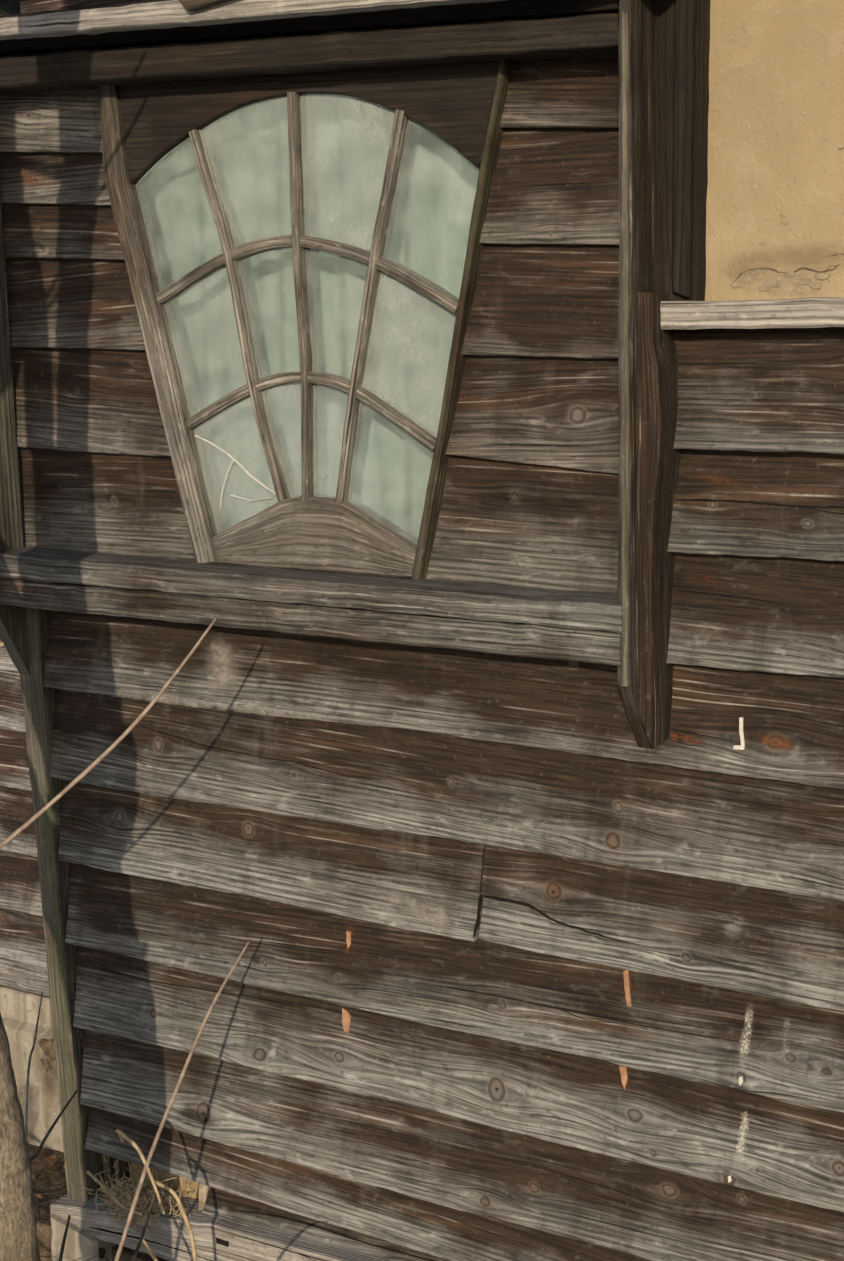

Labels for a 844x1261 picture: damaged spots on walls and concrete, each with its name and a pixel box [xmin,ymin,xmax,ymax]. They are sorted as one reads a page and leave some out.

crack [473,895,645,946]